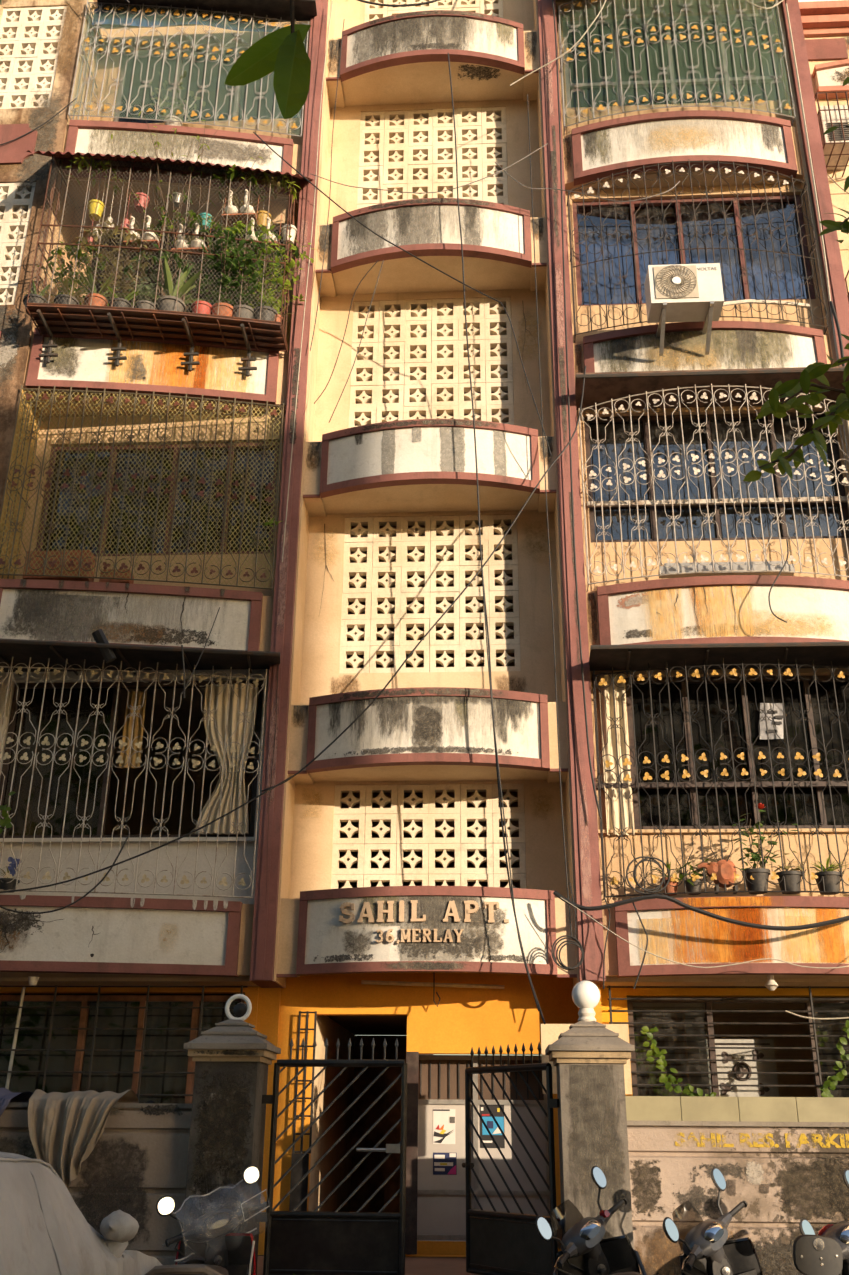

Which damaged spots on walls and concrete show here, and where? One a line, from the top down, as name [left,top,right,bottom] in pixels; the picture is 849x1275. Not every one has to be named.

leakage [328,10,537,81]
leakage [531,125,610,247]
leakage [346,198,493,255]
rust [109,340,247,392]
leakage [599,330,792,372]
leakage [4,579,217,647]
rust [648,586,753,641]
leakage [329,676,531,755]
rust [640,896,849,964]
leakage [74,1138,149,1241]
leakage [140,1071,252,1233]
leakage [726,1161,769,1195]